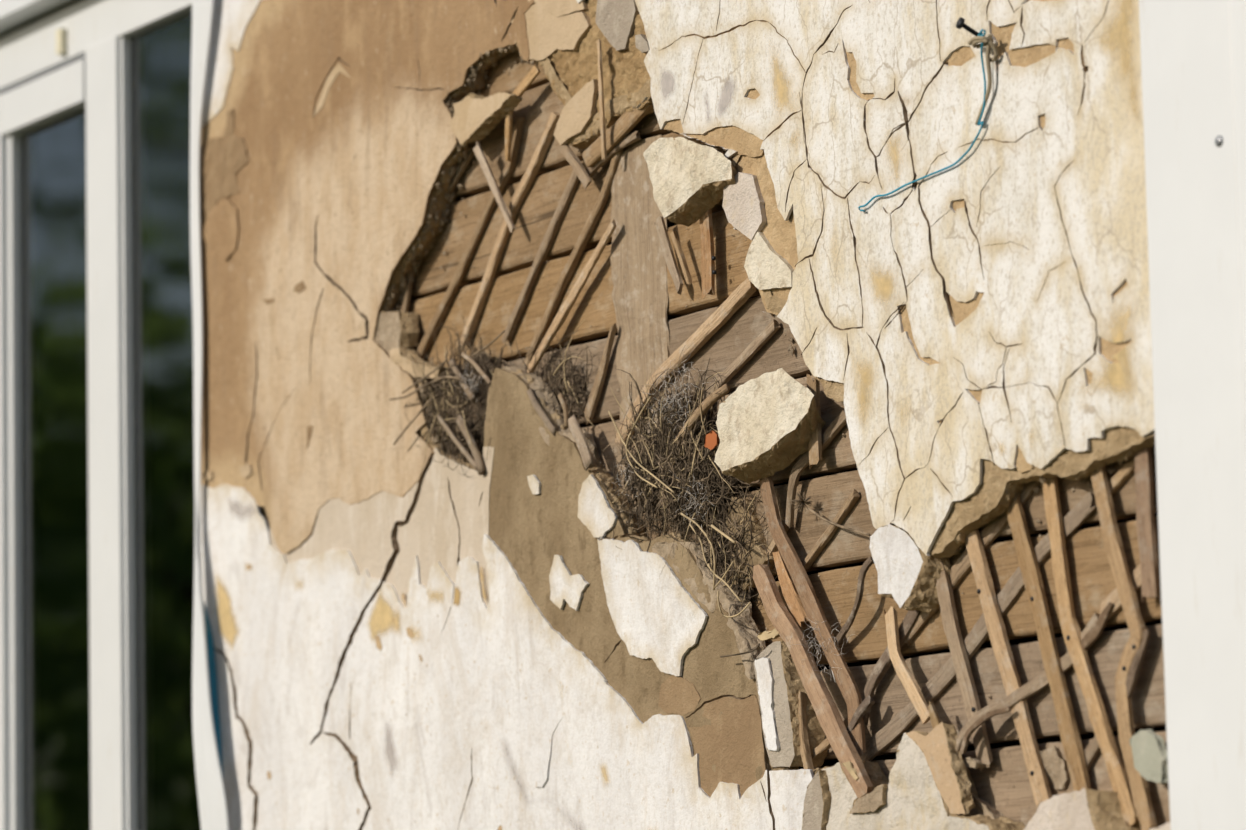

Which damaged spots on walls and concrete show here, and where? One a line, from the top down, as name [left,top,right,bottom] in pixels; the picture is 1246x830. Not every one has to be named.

peeling [946,46,975,66]
peeling [991,22,1074,67]
crack [1077,0,1109,116]
crack [657,0,1098,530]
crack [245,214,369,489]
peeling [200,0,822,797]
spalling [810,371,844,402]
crack [287,510,319,554]
spalling [930,426,1155,559]
crack [309,453,483,830]
crack [214,648,258,830]
peeling [1129,729,1168,785]